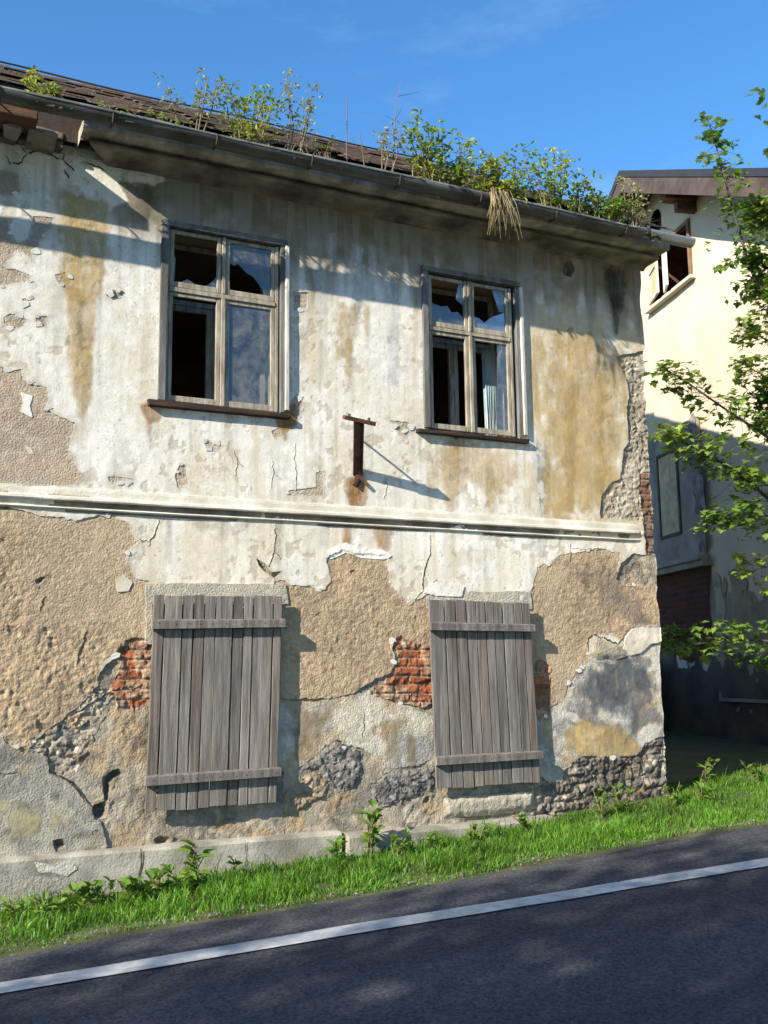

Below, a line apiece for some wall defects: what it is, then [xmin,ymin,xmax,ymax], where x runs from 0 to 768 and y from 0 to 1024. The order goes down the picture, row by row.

damp [62,193,107,408]
damp [605,266,625,315]
peeling [0,367,85,492]
rust [346,478,366,506]
spalling [529,351,726,722]
spalling [0,506,521,853]
crack [48,773,84,802]